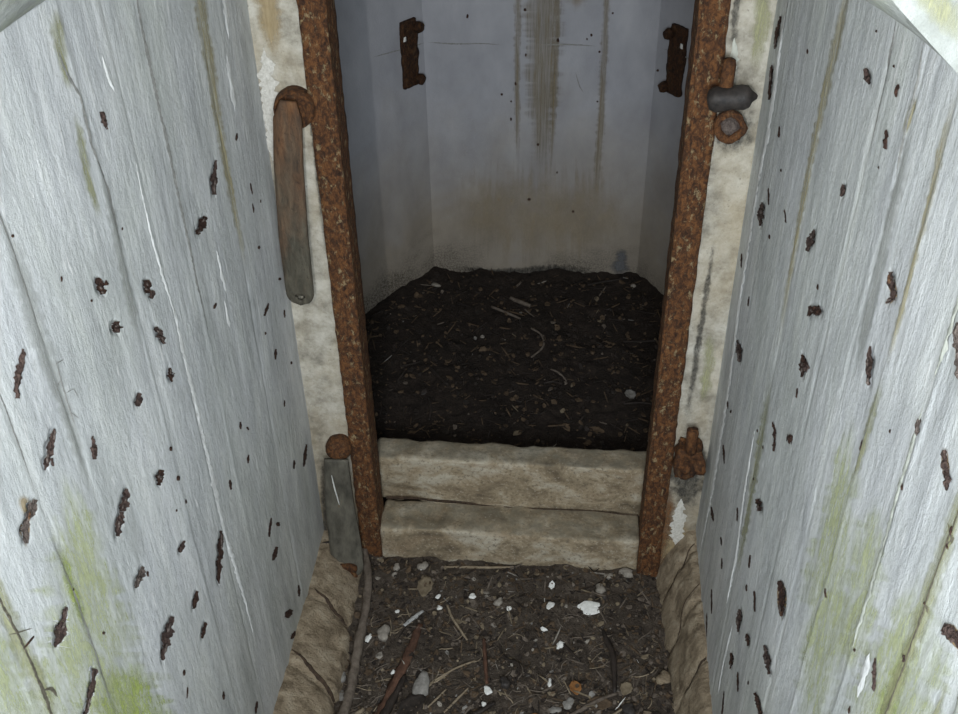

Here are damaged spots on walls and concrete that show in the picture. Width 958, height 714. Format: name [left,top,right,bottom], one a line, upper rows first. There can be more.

leakage [855,404,876,471]
rust [660,499,674,563]